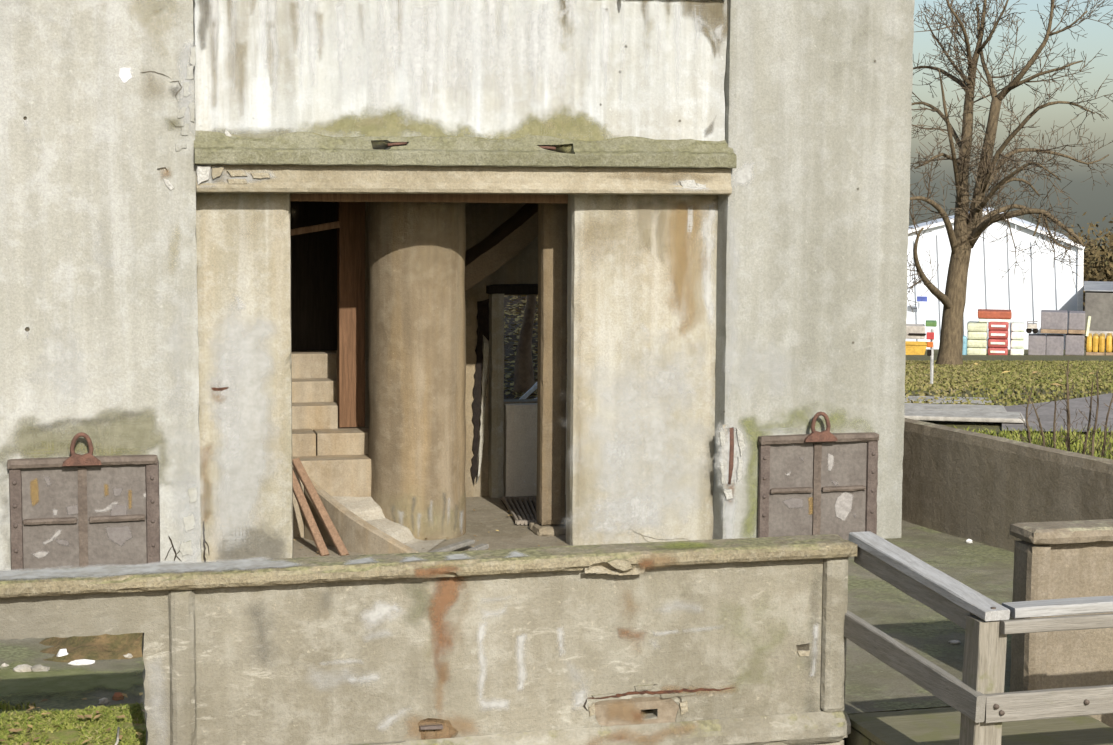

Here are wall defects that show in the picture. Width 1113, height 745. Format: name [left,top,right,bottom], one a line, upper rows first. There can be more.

leakage [381,0,572,96]
leakage [667,0,728,45]
spalling [119,45,196,151]
leakage [704,210,713,316]
leakage [0,411,165,464]
spalling [718,411,746,502]
rust [416,567,460,654]
spalling [588,697,688,727]